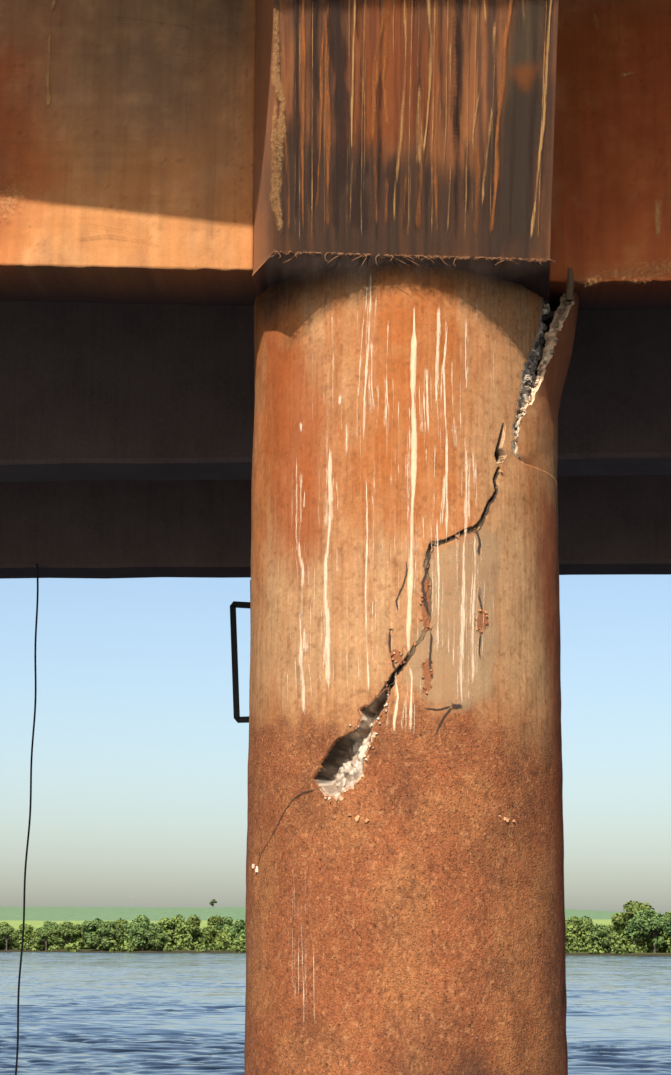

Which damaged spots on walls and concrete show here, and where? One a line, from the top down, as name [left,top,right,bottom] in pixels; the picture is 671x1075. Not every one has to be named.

water stain [264,0,552,314]
efflorescence [287,452,337,710]
efflorescence [358,309,494,730]
crack [382,298,548,696]
spalling [494,292,576,473]
crack [252,789,315,873]
spalling [311,687,392,803]
crack [426,704,461,734]
rust [542,511,568,1073]